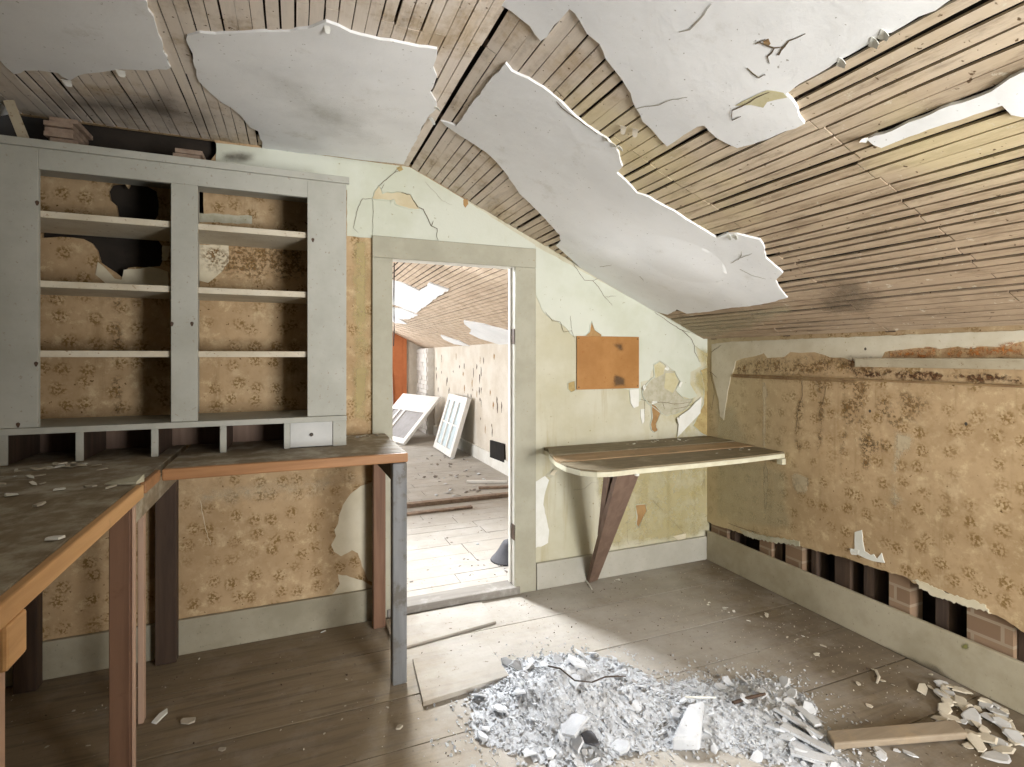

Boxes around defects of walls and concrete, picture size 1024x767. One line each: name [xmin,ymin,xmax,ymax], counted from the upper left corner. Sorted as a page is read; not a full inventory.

crack [731,34,805,121]
crack [353,171,451,239]
flaking render [0,0,1024,462]
peeling [536,467,557,547]
flaking render [740,529,800,551]
flaking render [912,579,992,638]